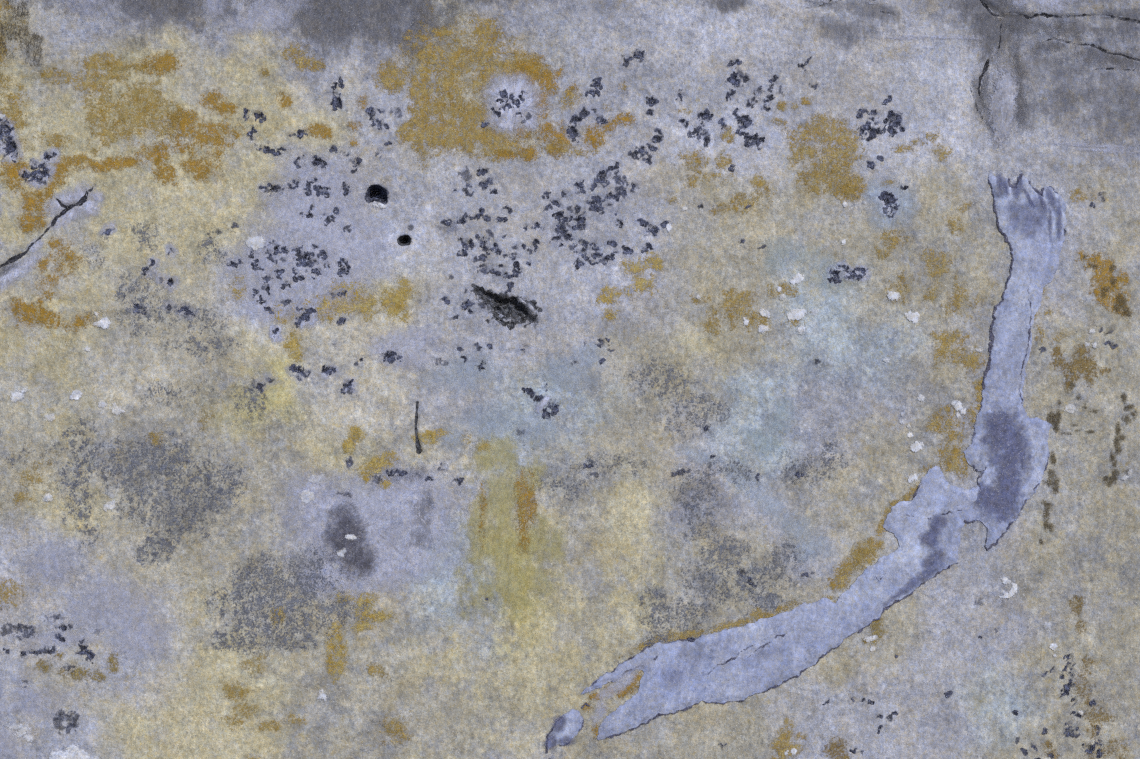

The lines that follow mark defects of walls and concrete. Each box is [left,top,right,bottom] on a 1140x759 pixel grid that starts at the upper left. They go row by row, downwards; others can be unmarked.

crack [0,187,93,268]
corrosion [0,0,241,331]
water stain [242,158,381,320]
spalling [481,89,525,127]
corrosion [373,15,636,169]
spalling [440,96,672,330]
corrosion [774,97,866,203]
spalling [876,186,909,219]
crack [971,0,1140,139]
water stain [115,272,238,357]
water stain [205,463,450,655]
spalling [1041,643,1103,758]